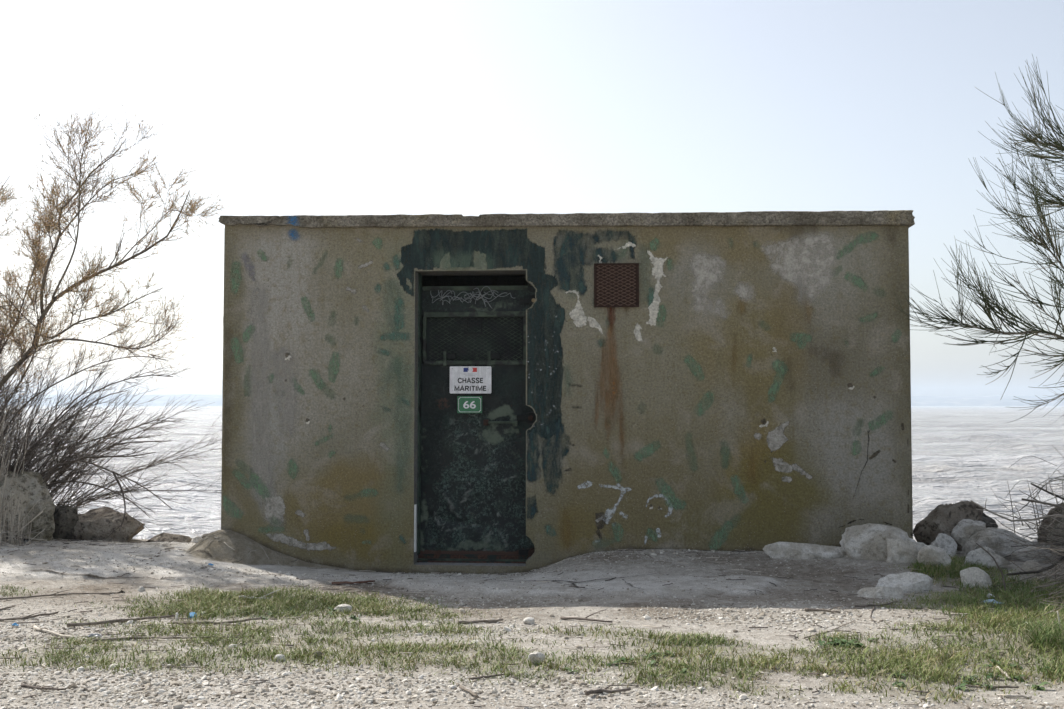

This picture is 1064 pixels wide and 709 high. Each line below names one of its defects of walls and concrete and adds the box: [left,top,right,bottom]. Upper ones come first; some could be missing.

peeling [565,290,603,334]
peeling [618,242,668,342]
peeling [754,419,812,482]
peeling [265,496,336,551]